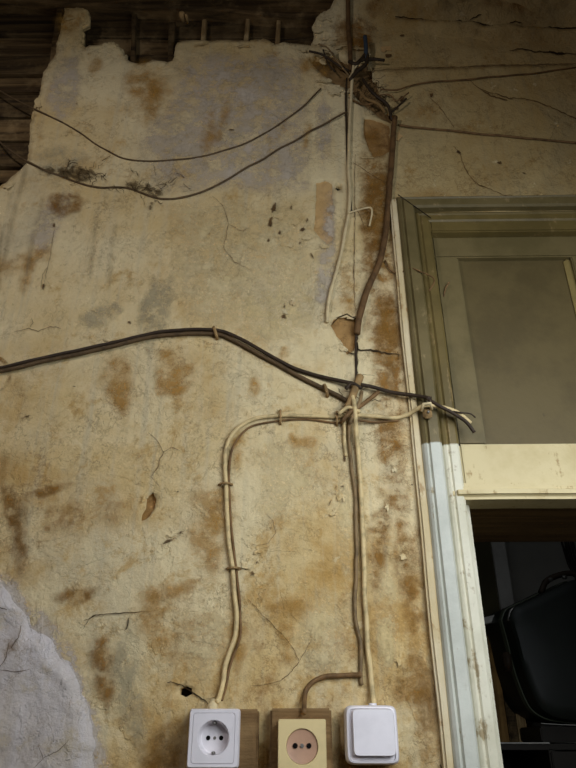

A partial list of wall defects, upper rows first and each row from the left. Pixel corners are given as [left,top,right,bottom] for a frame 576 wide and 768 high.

flaking render [295,42,404,158]
crack [372,48,576,119]
flaking render [268,181,341,302]
damp [361,132,393,283]
damp [372,289,404,406]
damp [379,410,404,463]
flaking render [141,493,156,521]
damp [370,511,387,588]
damp [396,521,422,633]
crack [0,626,29,672]